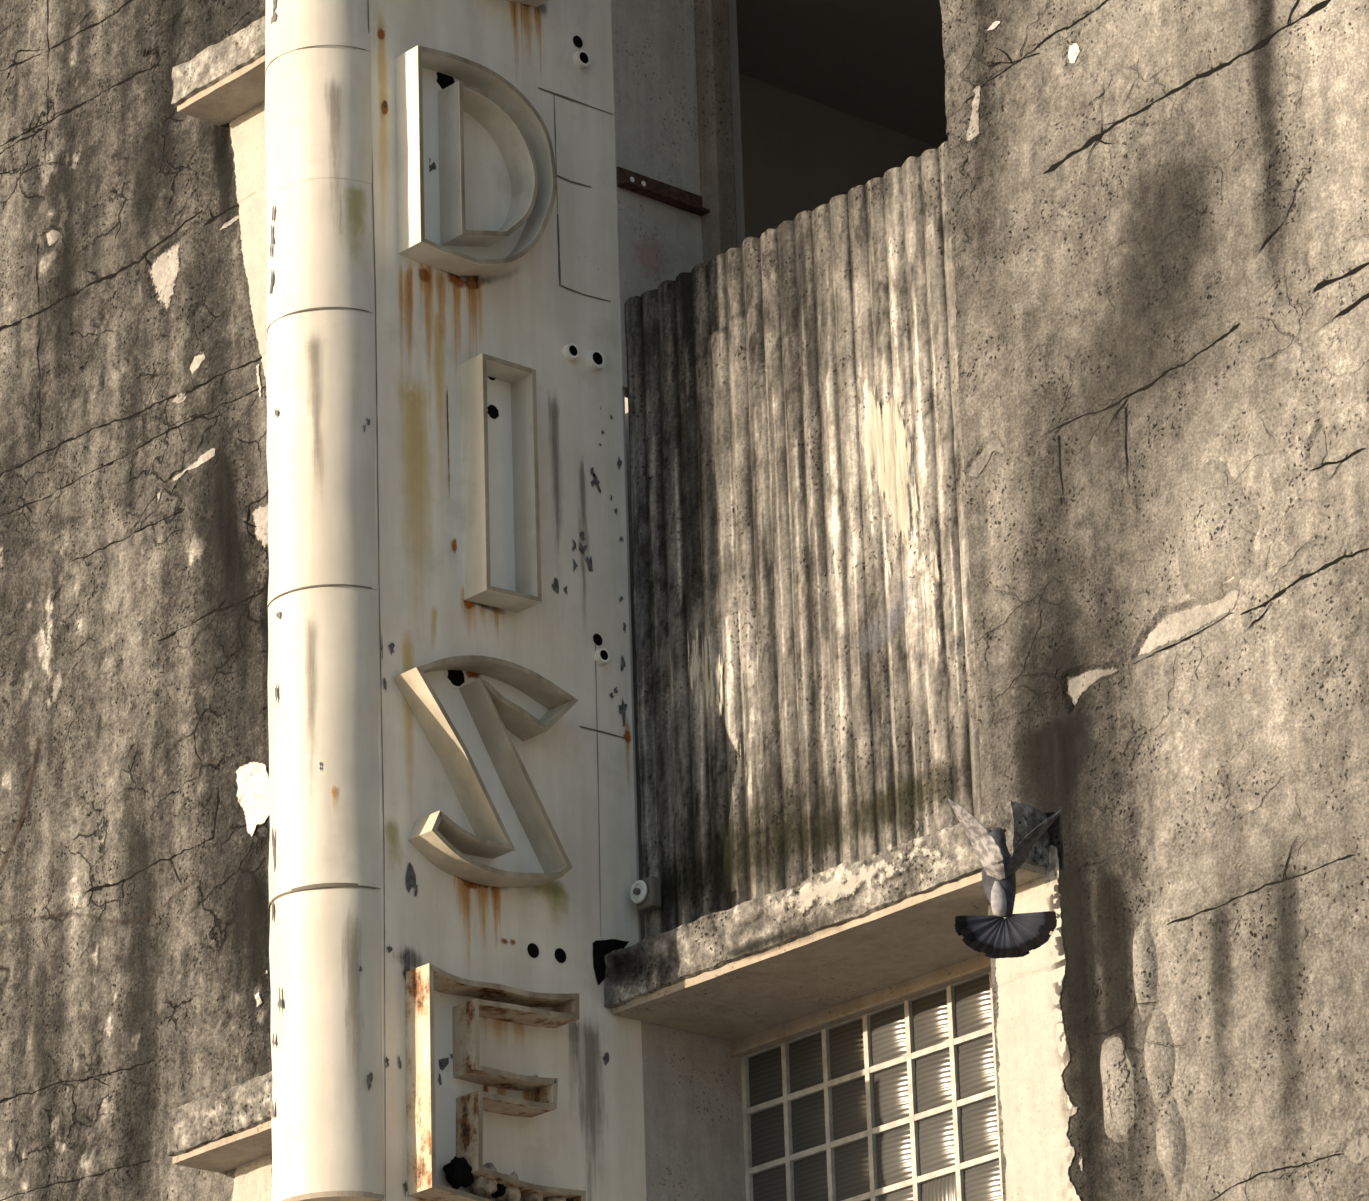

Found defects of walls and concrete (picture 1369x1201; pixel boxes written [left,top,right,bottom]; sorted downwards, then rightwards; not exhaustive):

crack [948,0,1108,118]
crack [1042,0,1330,174]
spalling [149,229,194,308]
corrosion [450,274,479,289]
crack [1313,262,1369,332]
crack [0,205,266,516]
spalling [1138,590,1240,655]
crack [1133,548,1369,664]
peeling [236,762,276,871]
leakage [731,839,940,955]
crack [1167,837,1354,925]
peeling [255,988,282,1013]